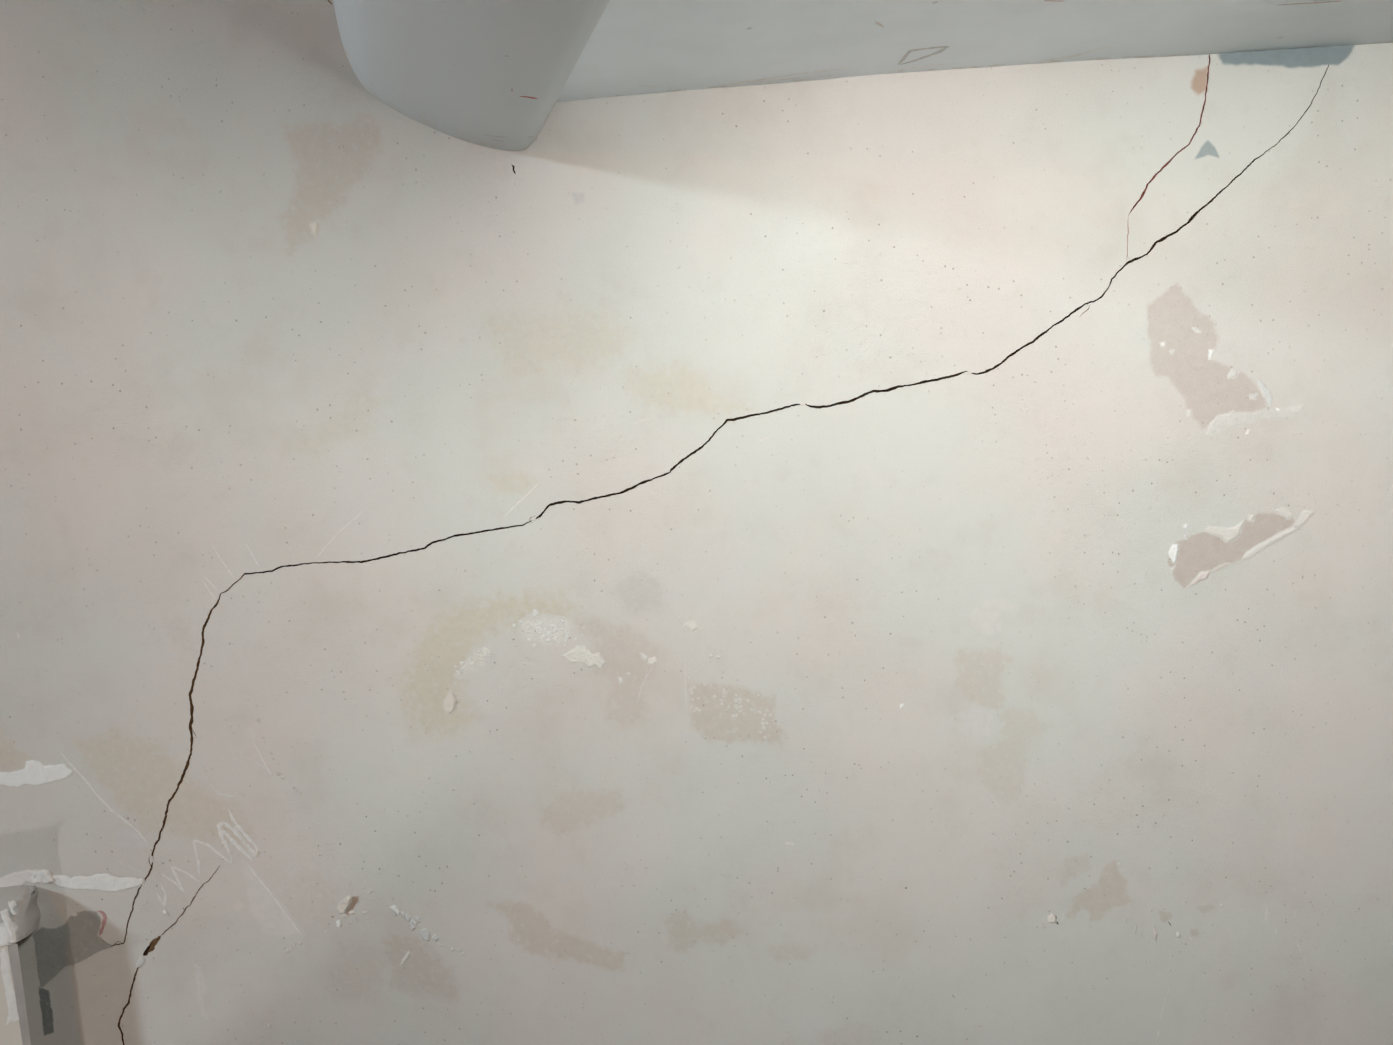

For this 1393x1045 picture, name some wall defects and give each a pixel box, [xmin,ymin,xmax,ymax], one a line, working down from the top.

peeling [1142,279,1307,440]
crack [99,54,1329,946]
peeling [1164,506,1316,593]
crack [118,867,219,1045]